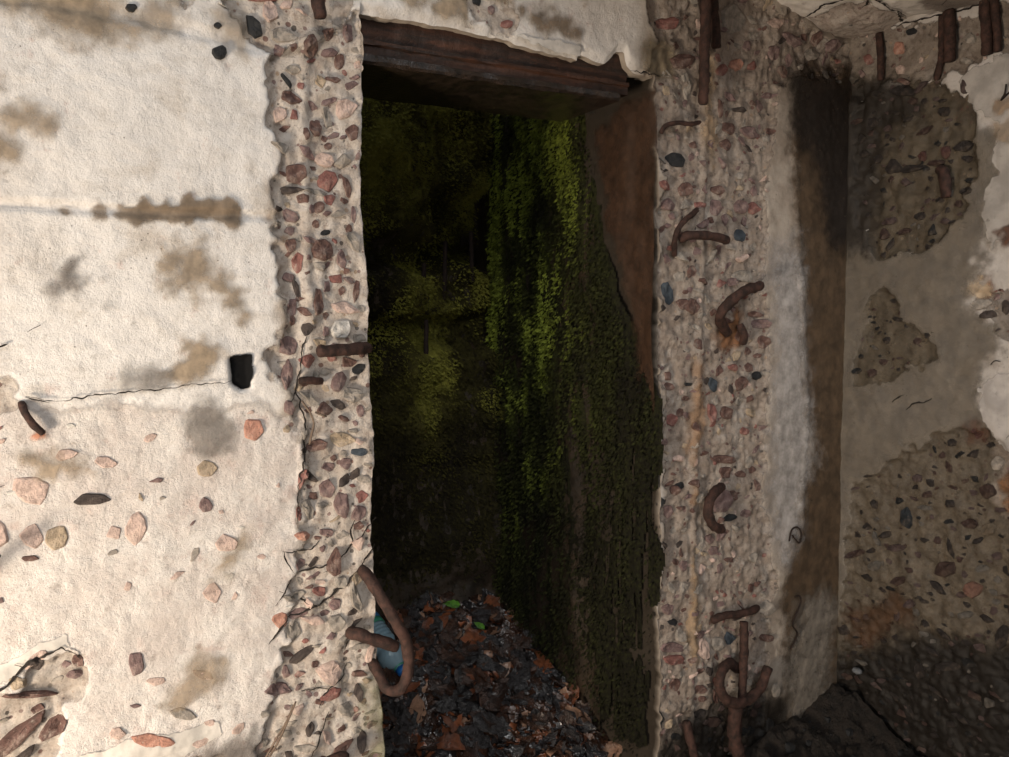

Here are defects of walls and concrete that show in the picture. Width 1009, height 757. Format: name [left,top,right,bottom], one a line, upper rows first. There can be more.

water stain [0,0,179,43]
water stain [405,0,470,29]
water stain [499,0,582,39]
water stain [0,106,56,160]
water stain [92,193,241,229]
crack [25,381,229,403]
spalling [0,0,415,757]
crack [291,330,309,522]
spalling [647,0,1009,757]
water stain [741,61,1009,757]
crack [269,517,376,644]
water stain [658,704,732,757]